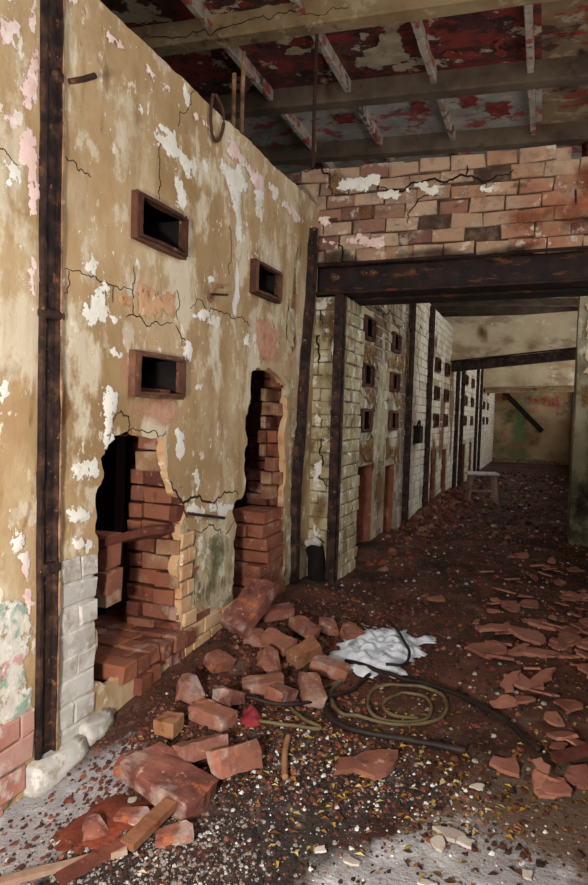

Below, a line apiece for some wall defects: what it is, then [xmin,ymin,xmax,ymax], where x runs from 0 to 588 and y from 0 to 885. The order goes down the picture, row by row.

crack [142,6,349,39]
peeling [355,23,411,69]
peeling [333,173,439,200]
crack [380,165,514,223]
crack [63,266,289,346]
peeling [0,380,10,415]
peeling [102,385,118,449]
peeling [71,457,100,481]
spalling [256,368,297,581]
flaking render [127,428,240,657]
crack [170,481,238,546]
peeling [0,527,36,818]